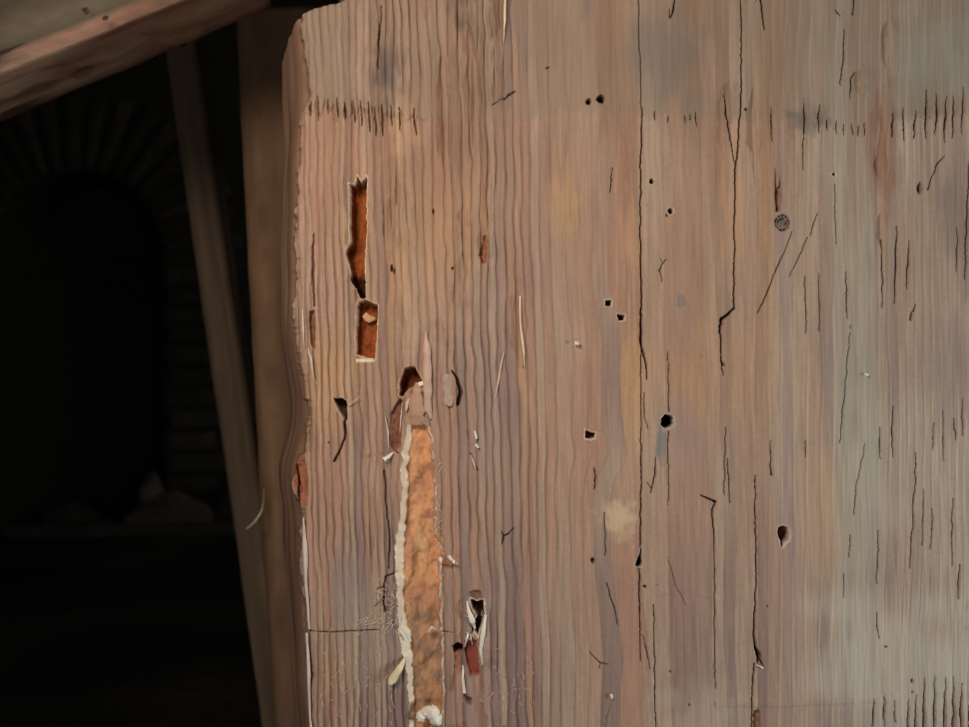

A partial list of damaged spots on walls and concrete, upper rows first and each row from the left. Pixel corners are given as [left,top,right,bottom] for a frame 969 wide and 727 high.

crack [834,0,856,100]
crack [718,0,838,376]
crack [880,226,917,322]
crack [606,0,670,727]
crack [591,467,599,491]
crack [838,271,964,600]
crack [601,513,609,556]
crack [667,557,687,606]
crack [699,427,731,690]
crack [750,441,773,726]
crack [873,612,881,639]